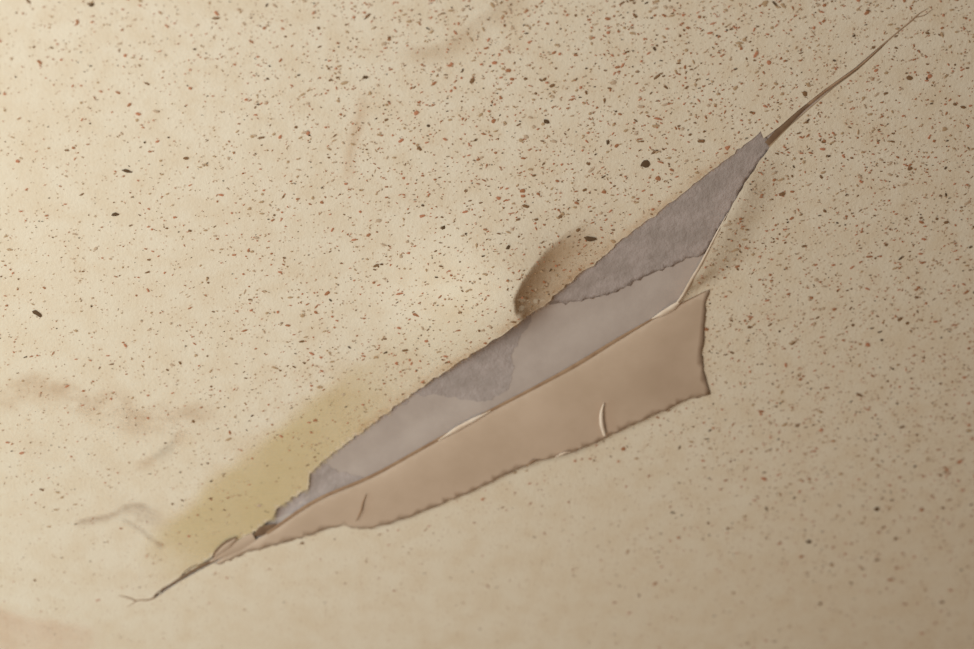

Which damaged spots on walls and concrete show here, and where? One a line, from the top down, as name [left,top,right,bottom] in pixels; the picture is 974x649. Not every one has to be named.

crack [765,8,931,145]
peeling [155,42,885,598]
crack [119,560,214,606]